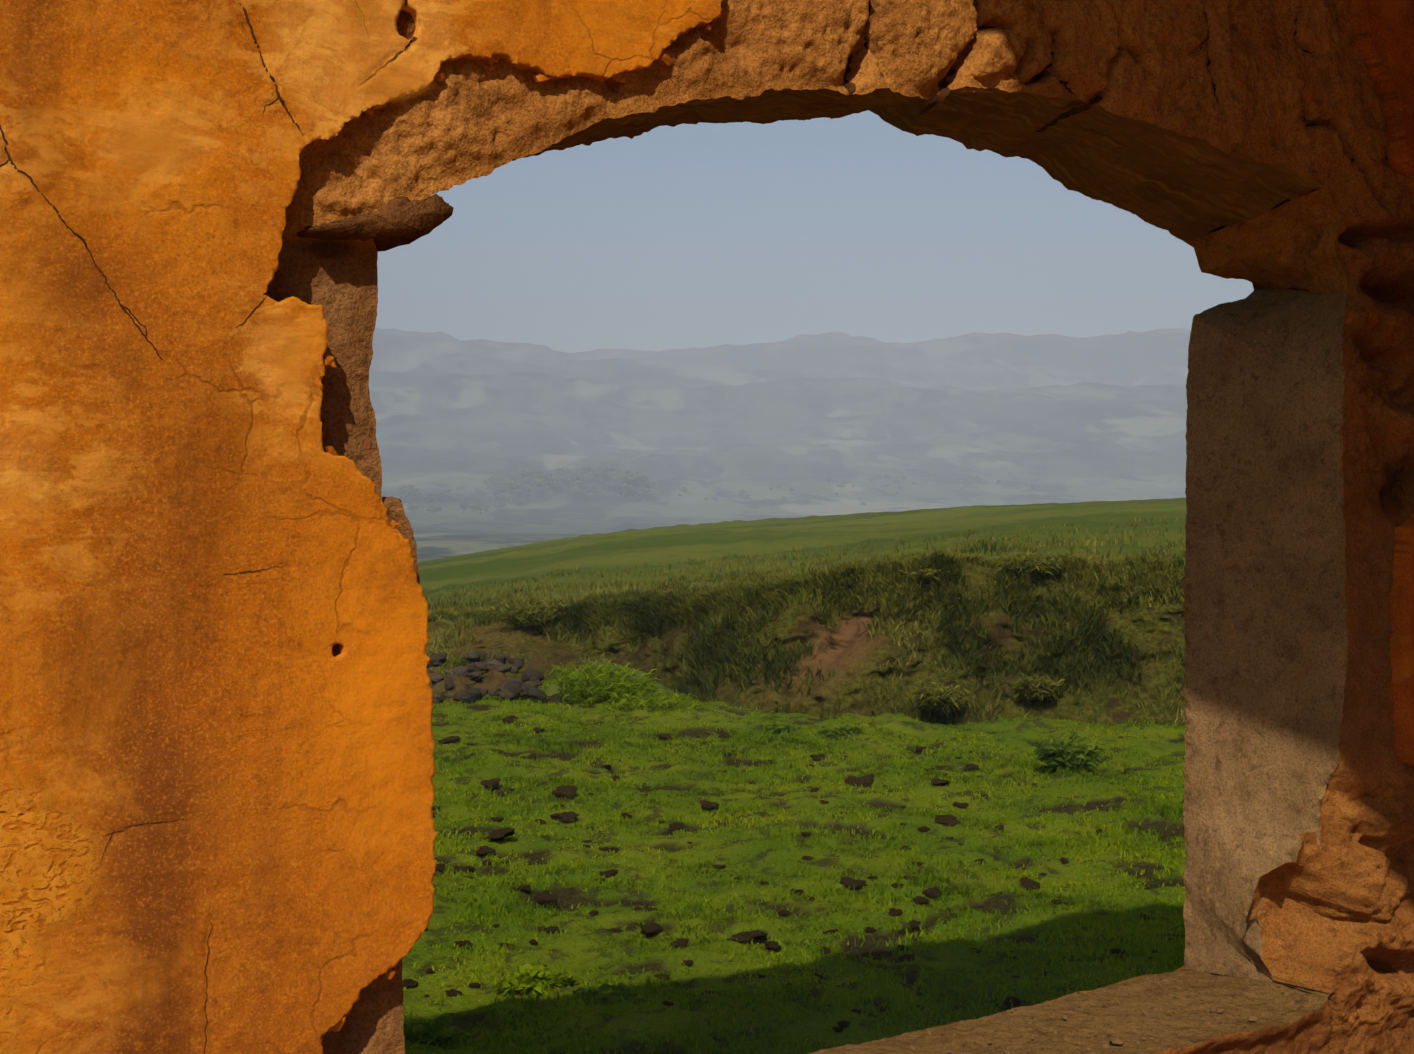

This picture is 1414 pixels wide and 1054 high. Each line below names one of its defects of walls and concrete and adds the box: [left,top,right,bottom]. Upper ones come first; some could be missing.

crack [238,0,303,135]
crack [356,0,417,85]
crack [843,1,884,94]
crack [0,125,164,361]
spalling [263,0,1408,500]
spalling [384,500,420,584]
spalling [1151,184,1414,1054]
spalling [321,956,405,1054]